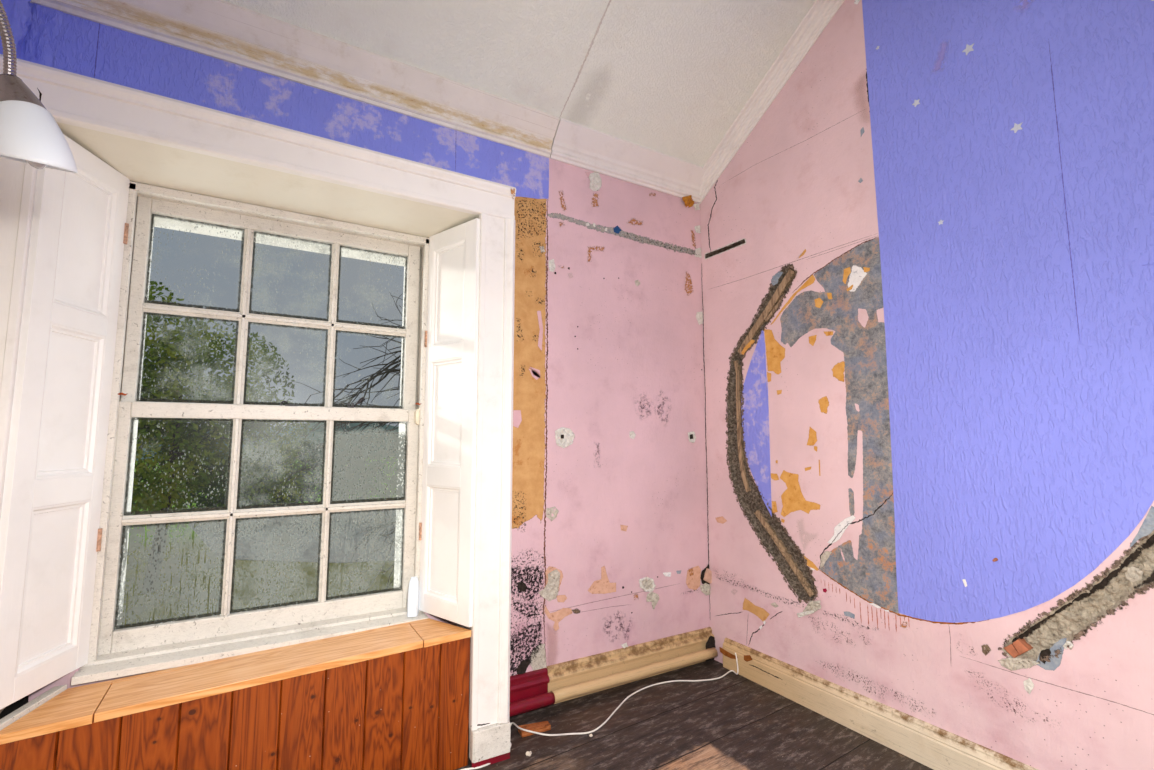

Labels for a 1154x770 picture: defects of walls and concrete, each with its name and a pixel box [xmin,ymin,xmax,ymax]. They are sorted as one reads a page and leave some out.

peeling [512,197,559,529]
flaking render [780,238,899,614]
damp [510,551,547,676]
spalling [539,566,580,631]
peeling [588,566,616,594]
spalling [663,564,712,596]